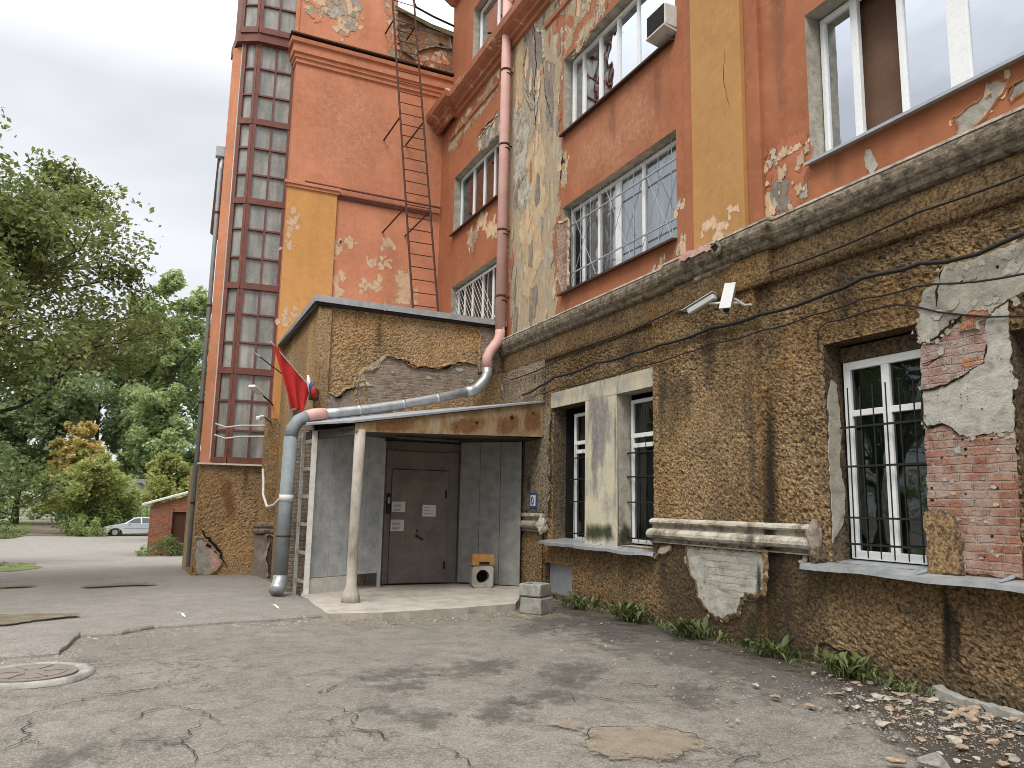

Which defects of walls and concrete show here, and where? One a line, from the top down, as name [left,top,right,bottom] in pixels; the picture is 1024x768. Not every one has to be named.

peeling [304,0,364,42]
spalling [949,68,1024,135]
peeling [448,0,610,334]
peeling [764,131,814,218]
peeling [358,237,418,305]
flaking render [911,299,1001,390]
flaking render [327,327,551,527]
water stain [591,398,608,487]
crack [199,527,228,569]
mould [586,526,612,539]
spalling [651,542,769,623]
flaking render [921,420,1024,579]